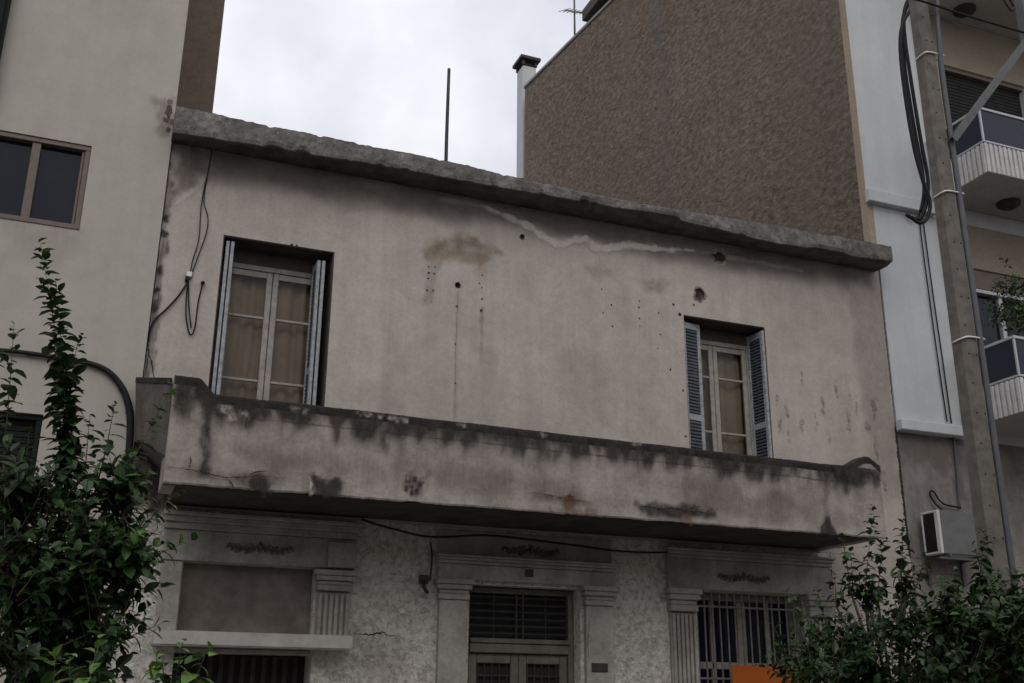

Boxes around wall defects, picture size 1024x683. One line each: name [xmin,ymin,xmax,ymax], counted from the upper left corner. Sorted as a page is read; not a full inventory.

water stain [166,151,855,279]
water stain [151,266,162,332]
spalling [693,286,707,303]
water stain [174,376,881,492]
crack [168,457,287,488]
water stain [310,474,343,498]
spalling [404,473,424,495]